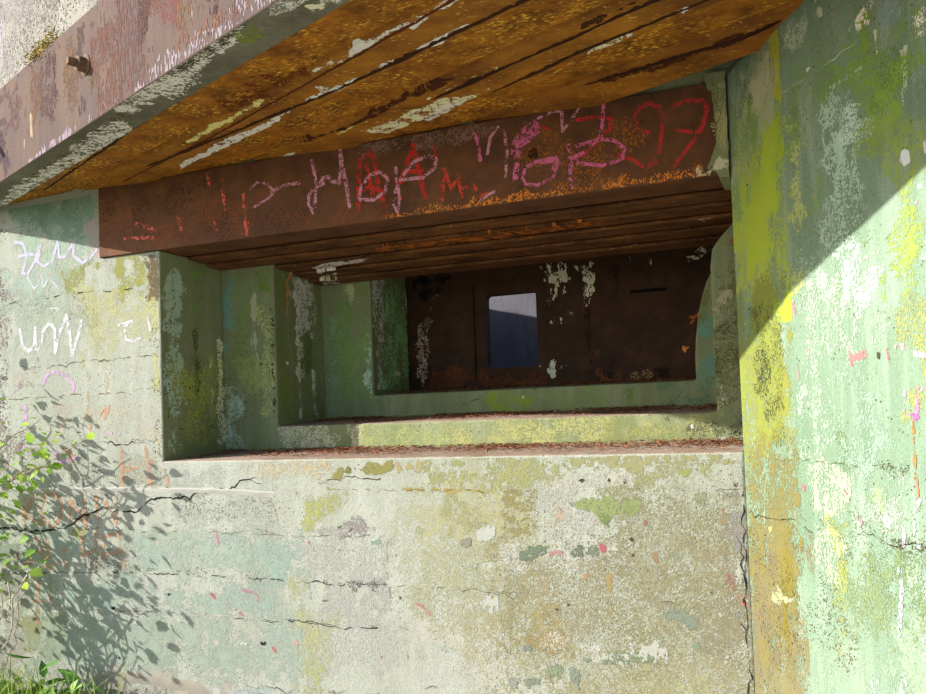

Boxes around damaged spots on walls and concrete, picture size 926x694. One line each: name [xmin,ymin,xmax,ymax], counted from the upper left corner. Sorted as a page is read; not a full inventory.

water stain [312,0,457,72]
water stain [417,24,469,50]
corrosion [0,0,249,178]
water stain [0,0,340,207]
corrosion [300,77,454,142]
water stain [336,88,490,135]
corrosion [99,115,703,255]
peeling [540,262,595,307]
peeling [540,359,567,378]
crack [0,477,261,535]
crack [834,527,924,552]
crack [680,466,811,694]